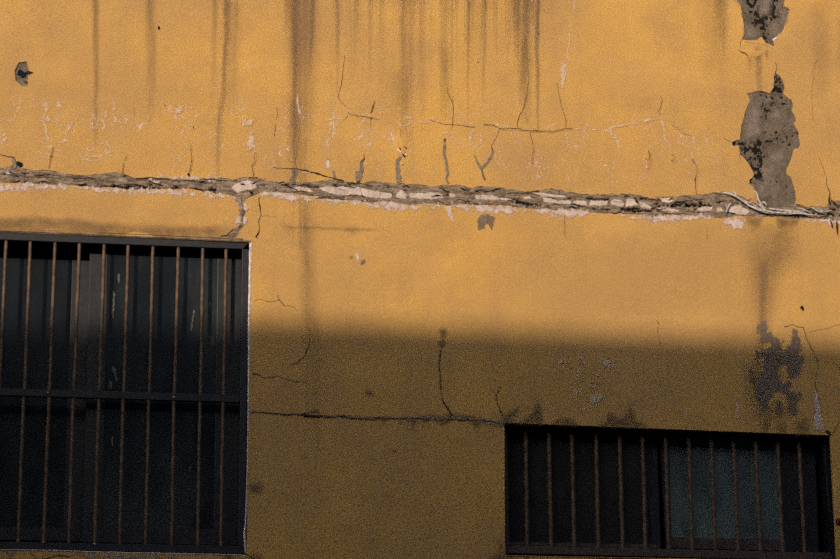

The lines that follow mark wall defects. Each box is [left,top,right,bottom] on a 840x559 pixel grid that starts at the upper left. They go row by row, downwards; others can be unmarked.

flaking render [737,0,790,58]
flaking render [15,62,33,86]
crack [251,138,365,183]
crack [338,55,380,129]
crack [394,156,402,183]
crack [431,39,572,184]
crack [691,151,699,195]
flaking render [724,62,814,216]
crack [251,338,310,383]
crack [250,348,505,427]
crack [784,303,840,404]